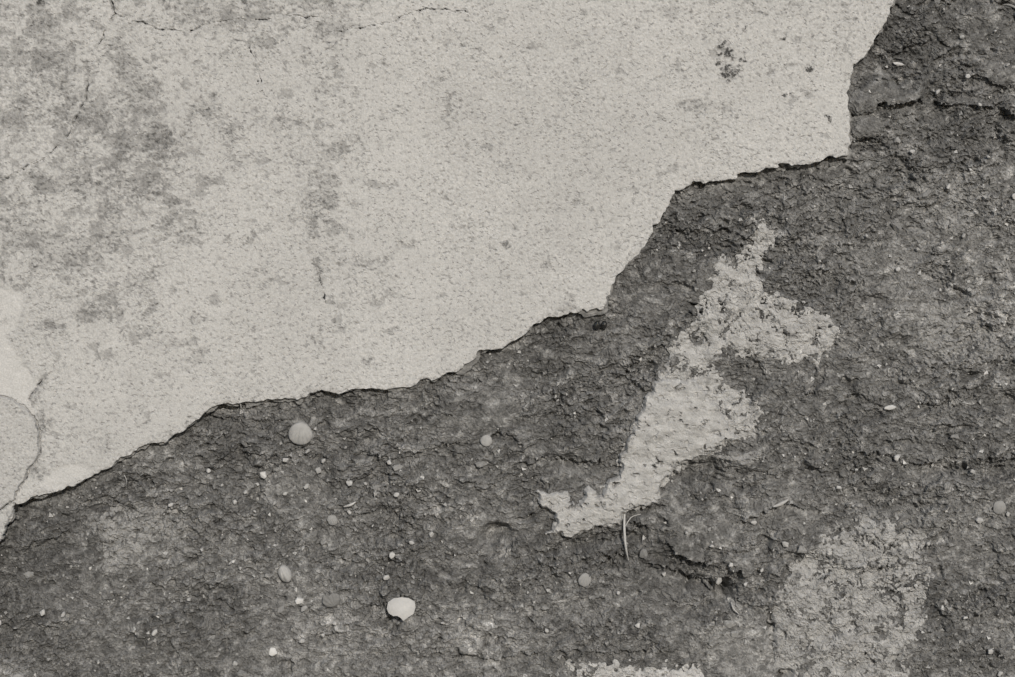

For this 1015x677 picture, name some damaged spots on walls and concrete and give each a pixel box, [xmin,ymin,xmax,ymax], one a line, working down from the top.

peeling [920,300,952,326]
peeling [924,313,1005,369]
peeling [96,501,188,577]
spalling [798,607,833,624]
spalling [873,621,890,642]
spalling [796,637,817,677]